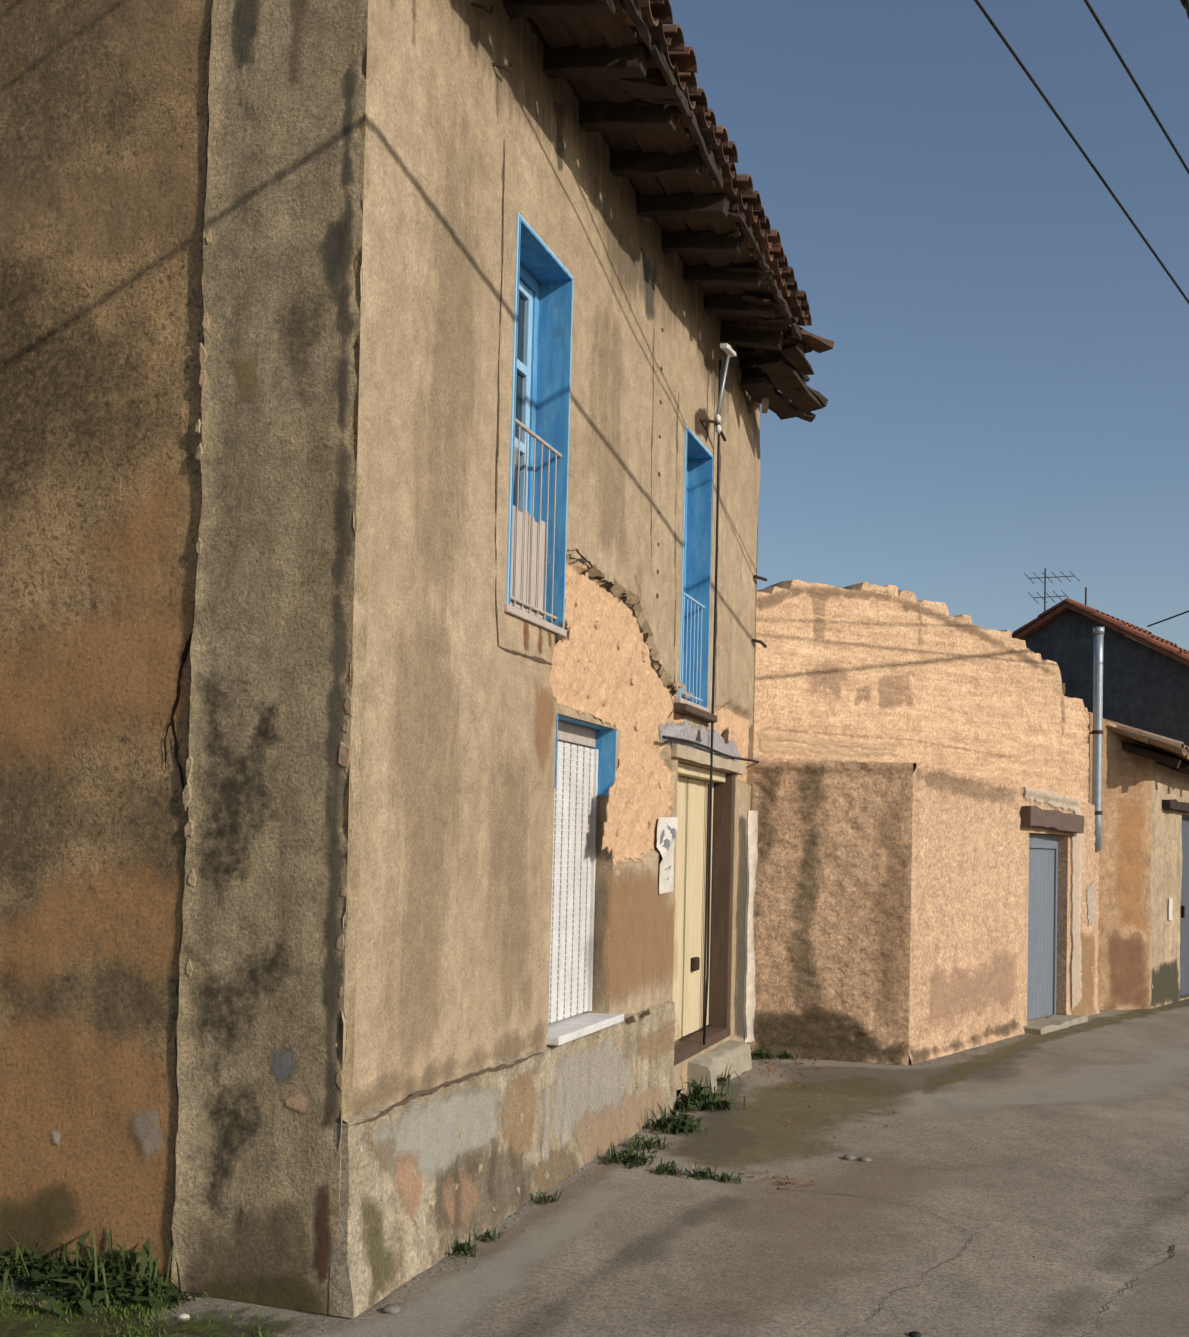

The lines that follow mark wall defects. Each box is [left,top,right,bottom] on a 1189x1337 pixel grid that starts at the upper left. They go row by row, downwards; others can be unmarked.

crack [202,0,213,245]
water stain [324,66,355,337]
water stain [0,266,125,505]
crack [195,283,209,478]
crack [195,517,203,563]
crack [164,599,196,1109]
water stain [324,449,351,1125]
spalling [549,562,687,865]
spalling [697,706,750,784]
water stain [736,767,1018,1065]
peeling [396,1156,495,1229]
peeling [533,1082,665,1194]